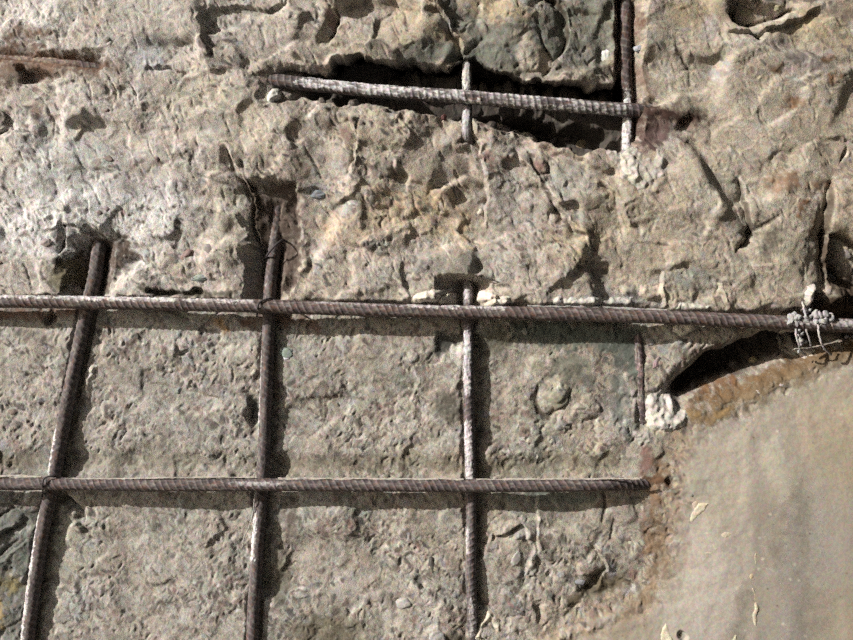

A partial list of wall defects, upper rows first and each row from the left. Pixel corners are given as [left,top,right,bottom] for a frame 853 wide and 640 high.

corrosion [0,26,118,82]
spalling [0,0,853,316]
corrosion [0,309,78,321]
corrosion [59,231,137,293]
corrosion [786,225,853,319]
corrosion [686,341,853,423]
spalling [0,294,853,640]
corrosion [640,447,671,554]